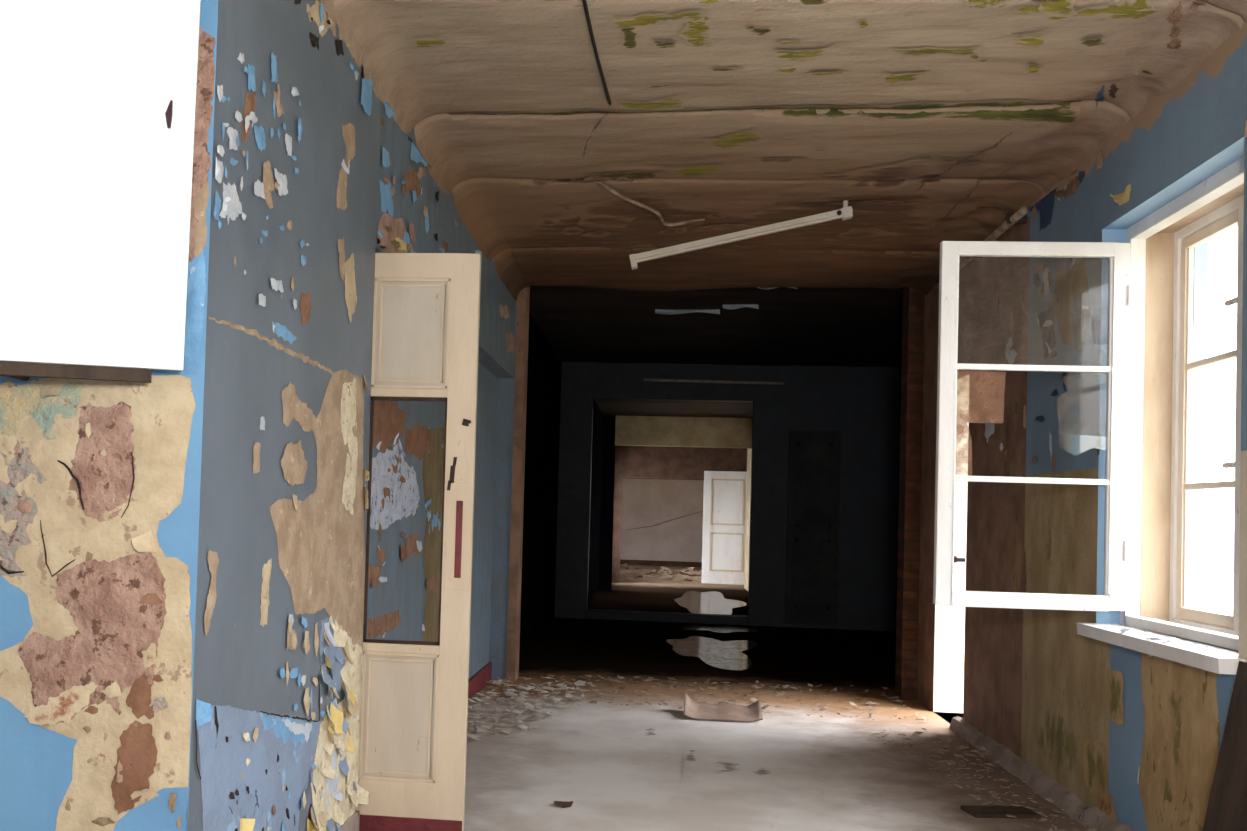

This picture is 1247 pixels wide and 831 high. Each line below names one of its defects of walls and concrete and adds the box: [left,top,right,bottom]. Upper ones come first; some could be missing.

peeling [294,0,398,126]
peeling [336,123,355,210]
peeling [377,136,449,253]
peeling [338,237,357,324]
peeling [0,25,311,831]
peeling [243,369,457,831]
leakage [1106,668,1124,726]
leakage [1078,734,1108,797]